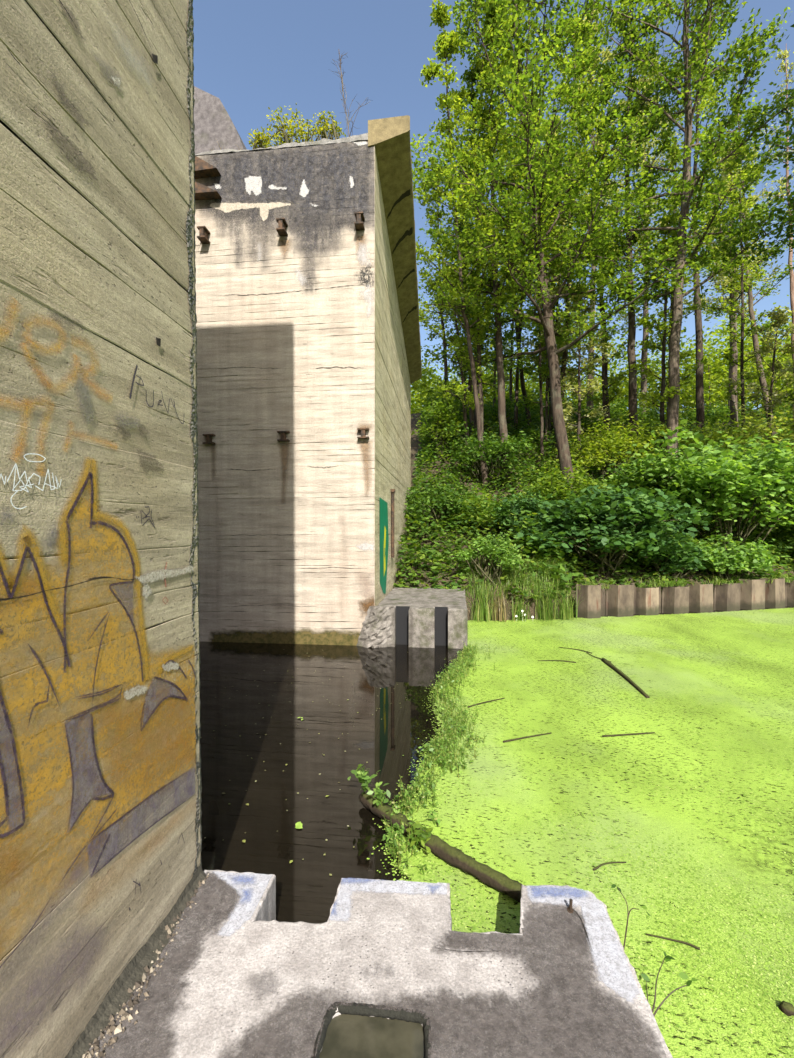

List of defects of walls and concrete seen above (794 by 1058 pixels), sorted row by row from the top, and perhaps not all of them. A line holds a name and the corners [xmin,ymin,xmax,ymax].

spalling [244,176,287,195]
spalling [299,180,317,207]
leakage [206,141,374,288]